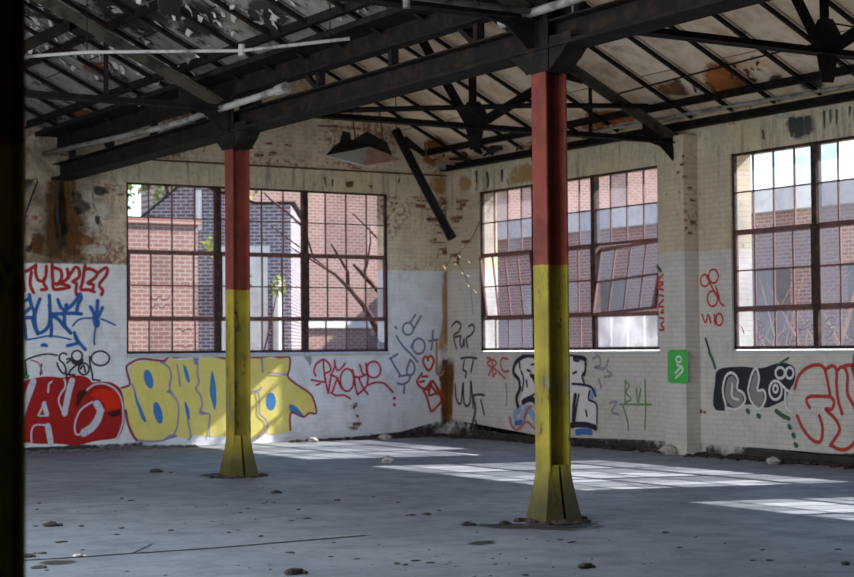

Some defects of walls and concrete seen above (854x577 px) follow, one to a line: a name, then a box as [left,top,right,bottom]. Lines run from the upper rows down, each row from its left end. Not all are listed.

peeling [25,0,54,36]
peeling [59,42,125,89]
corrosion [702,64,746,91]
corrosion [31,177,89,262]
peeling [80,190,111,255]